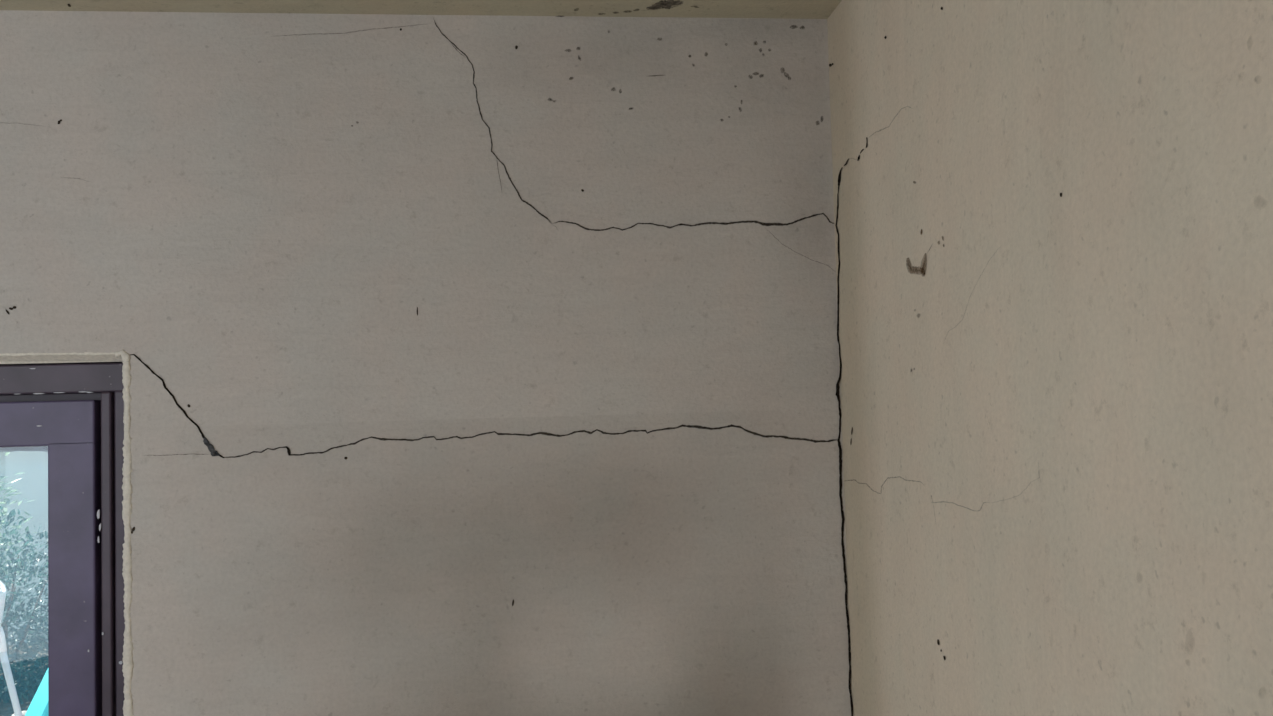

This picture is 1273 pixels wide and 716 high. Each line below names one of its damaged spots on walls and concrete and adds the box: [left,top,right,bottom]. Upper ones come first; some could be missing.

crack [130,22,919,716]